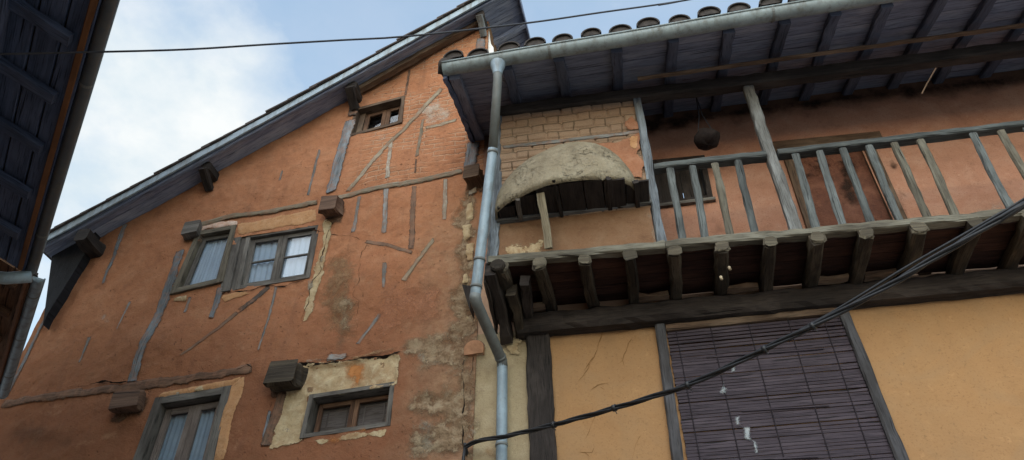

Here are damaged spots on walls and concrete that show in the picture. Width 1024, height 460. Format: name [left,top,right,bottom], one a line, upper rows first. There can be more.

peeling [597,116,644,177]
peeling [202,209,332,321]
crack [299,229,400,367]
spalling [269,192,482,458]
spalling [505,240,543,254]